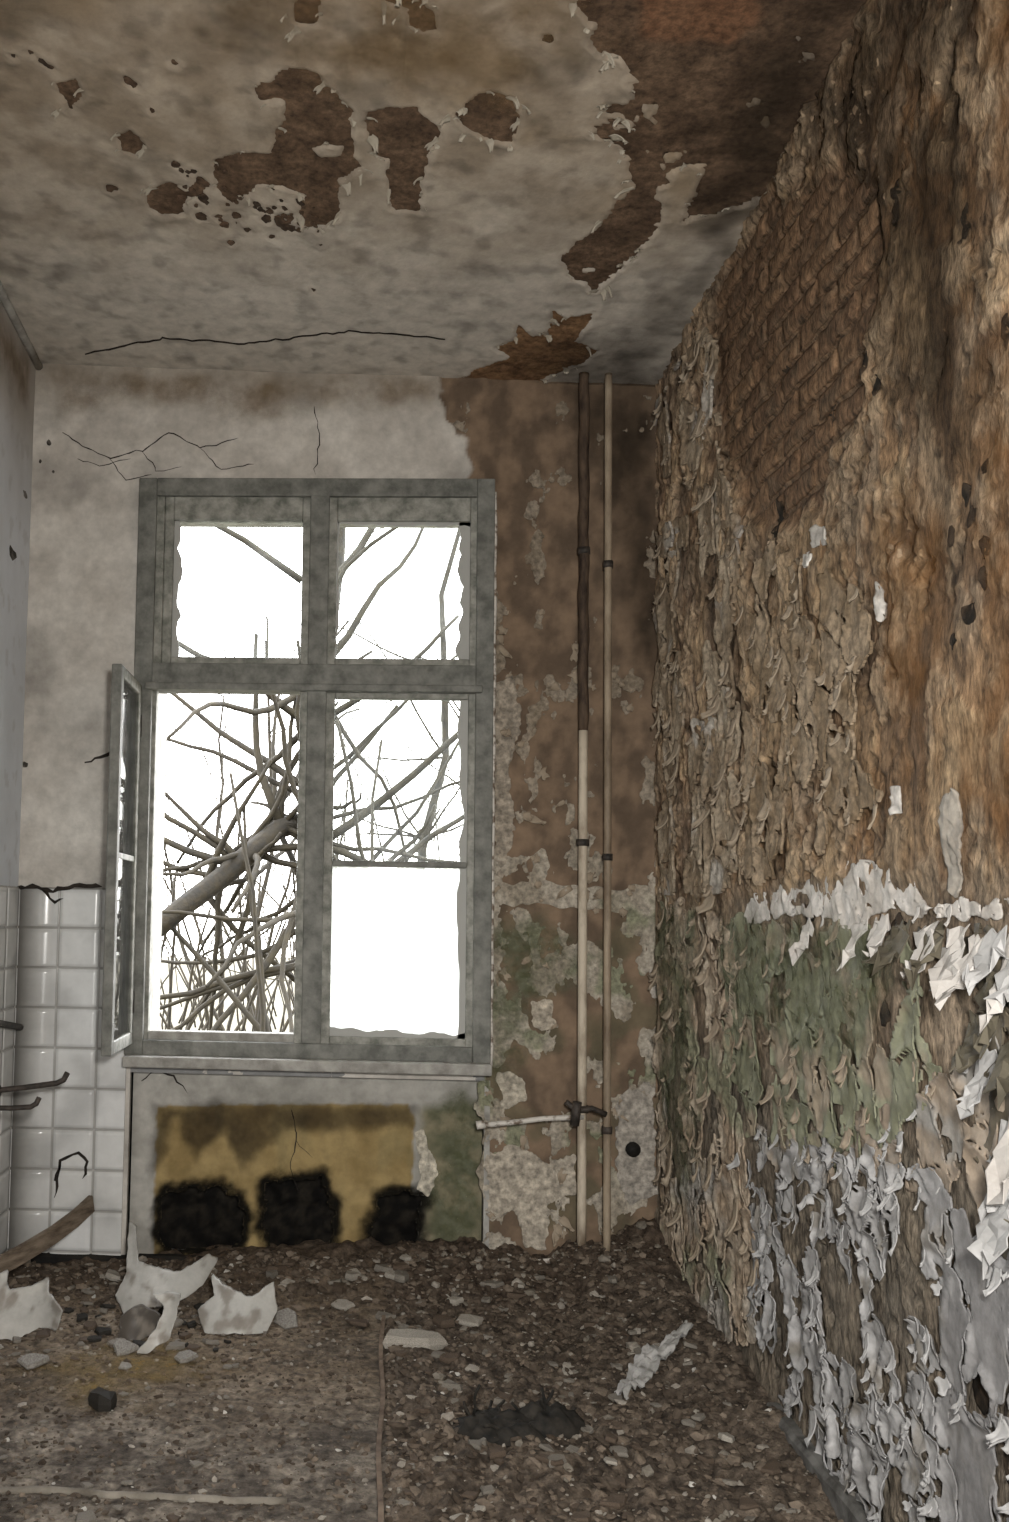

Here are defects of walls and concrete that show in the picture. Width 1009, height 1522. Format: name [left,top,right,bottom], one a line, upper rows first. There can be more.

peeling [280,0,323,42]
peeling [381,0,439,33]
peeling [110,130,147,158]
peeling [140,68,531,246]
crack [85,330,445,355]
peeling [467,0,1009,1522]
leakage [162,1106,332,1154]
crack [1001,1390,1009,1445]